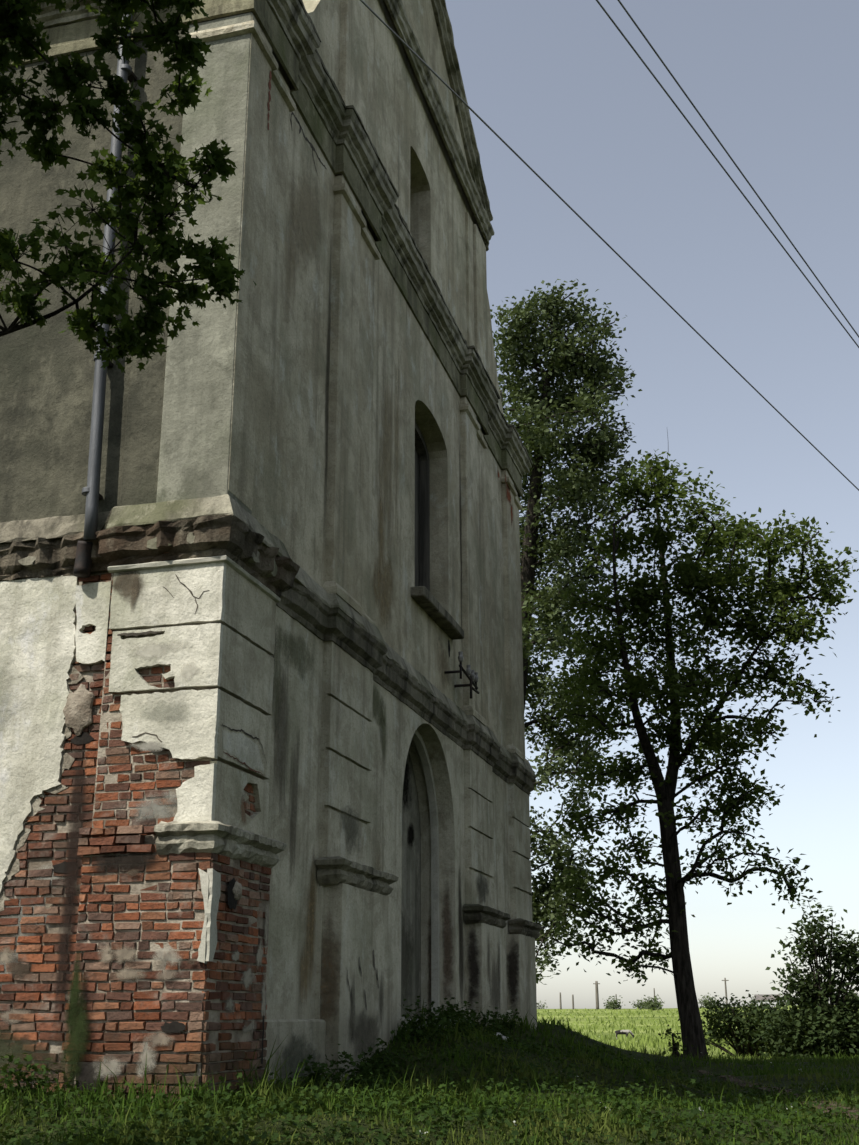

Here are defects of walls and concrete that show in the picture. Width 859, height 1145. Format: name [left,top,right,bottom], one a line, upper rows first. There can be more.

crack [164,574,209,613]
flaking render [0,573,271,1105]
water stain [401,920,413,995]
water stain [459,876,519,1012]